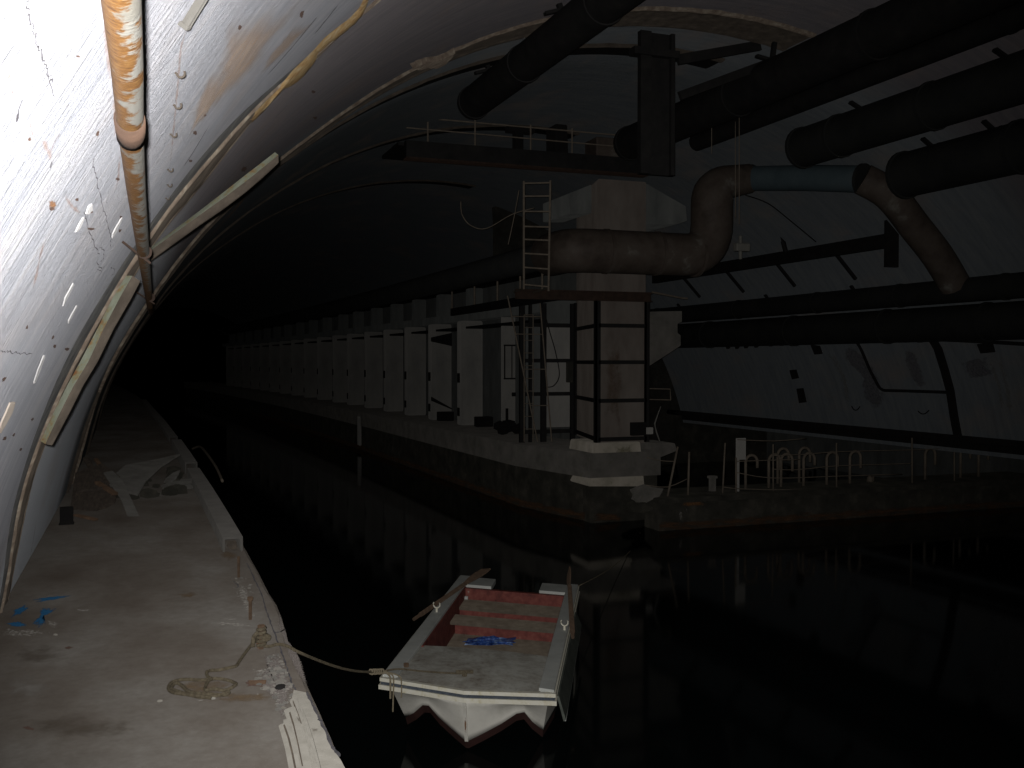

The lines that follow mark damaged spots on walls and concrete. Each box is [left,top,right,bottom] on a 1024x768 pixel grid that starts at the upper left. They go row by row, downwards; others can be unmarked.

crack [16,0,55,122]
crack [84,127,115,275]
spalling [277,615,306,684]